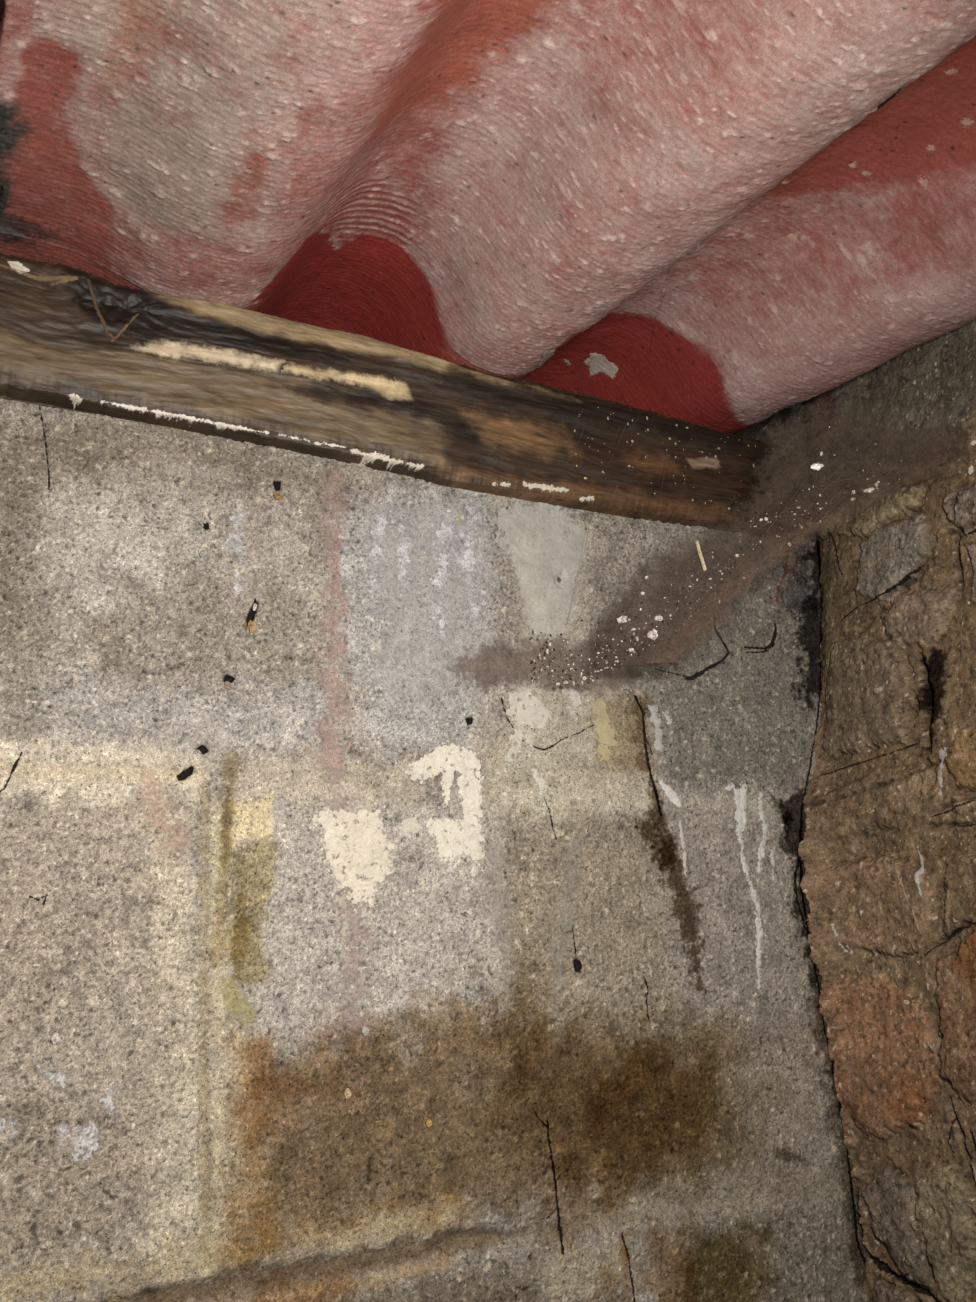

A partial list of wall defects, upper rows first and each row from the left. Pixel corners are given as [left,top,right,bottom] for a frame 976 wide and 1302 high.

leakage [138,341,410,398]
leakage [535,349,618,380]
crack [654,617,777,680]
leakage [792,539,822,708]
peeling [309,682,571,963]
crack [634,695,663,815]
leakage [648,704,672,751]
leakage [641,780,705,990]
leakage [725,781,818,993]
crack [804,658,918,794]
crack [532,1108,565,1255]
crack [847,1149,940,1302]